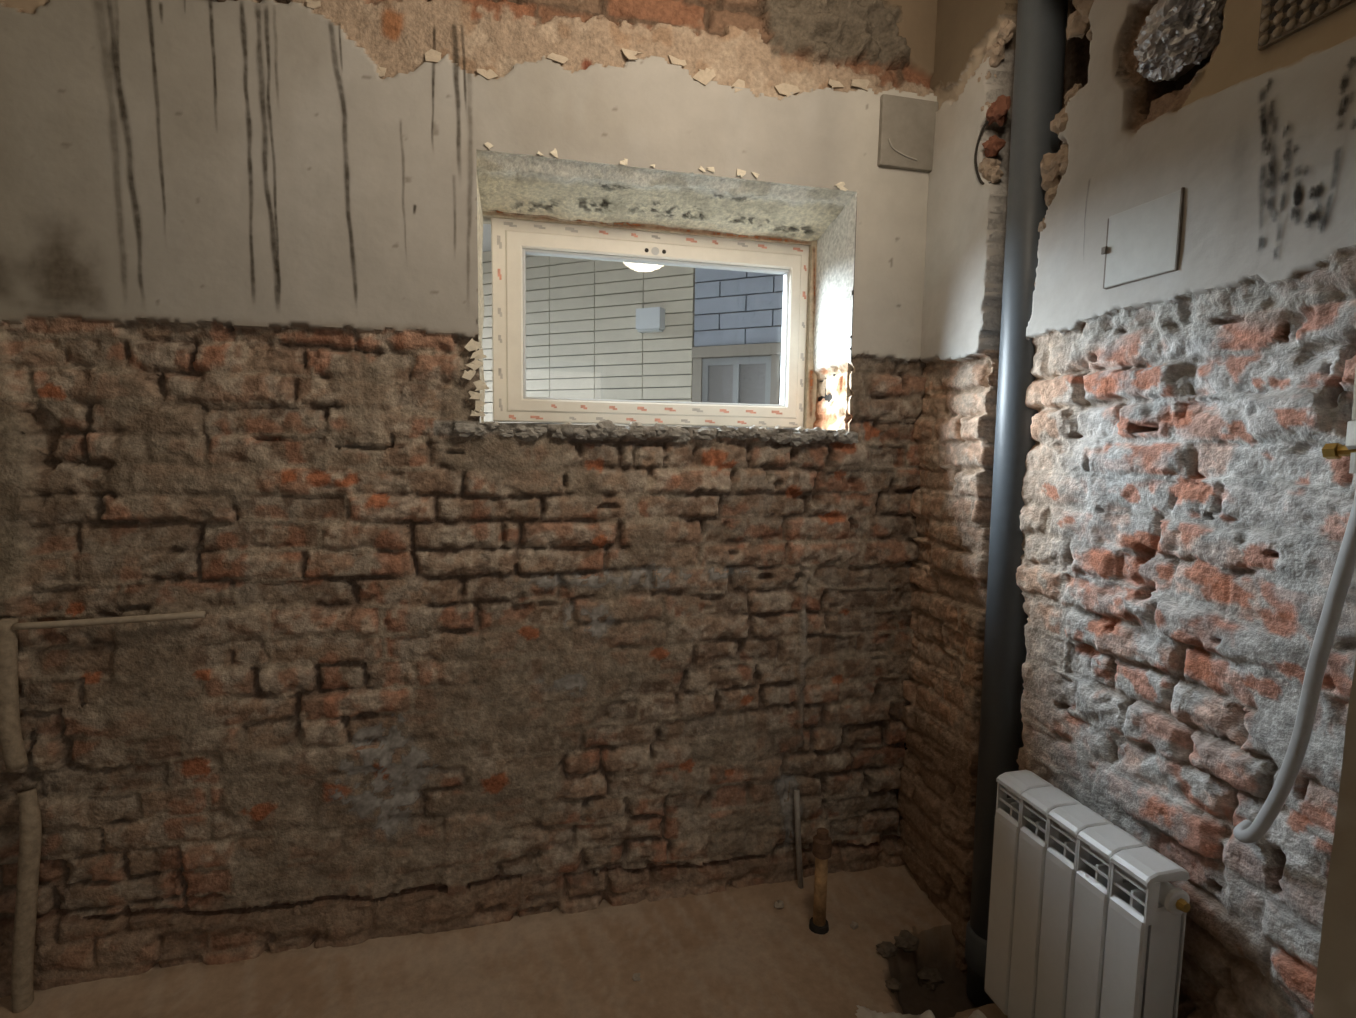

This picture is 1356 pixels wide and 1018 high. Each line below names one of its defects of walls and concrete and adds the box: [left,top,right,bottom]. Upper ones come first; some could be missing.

damp [147,0,162,77]
damp [241,6,273,185]
damp [454,37,466,146]
flaking render [217,0,937,101]
flaking render [1066,0,1094,41]
flaking render [1114,0,1356,134]
damp [266,186,280,292]
damp [345,164,354,262]
flaking render [1038,83,1082,232]
damp [1259,80,1340,256]
spalling [453,338,859,447]
spalling [882,924,979,1018]